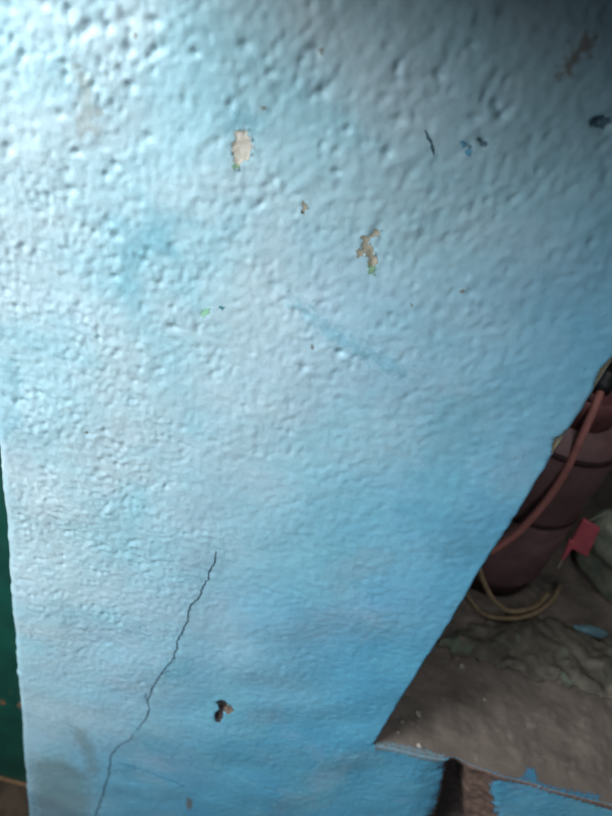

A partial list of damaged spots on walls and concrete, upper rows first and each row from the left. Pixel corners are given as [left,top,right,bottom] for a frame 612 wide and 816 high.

peeling [229,128,254,171]
peeling [356,229,380,275]
crack [95,552,216,815]
spalling [215,700,234,723]